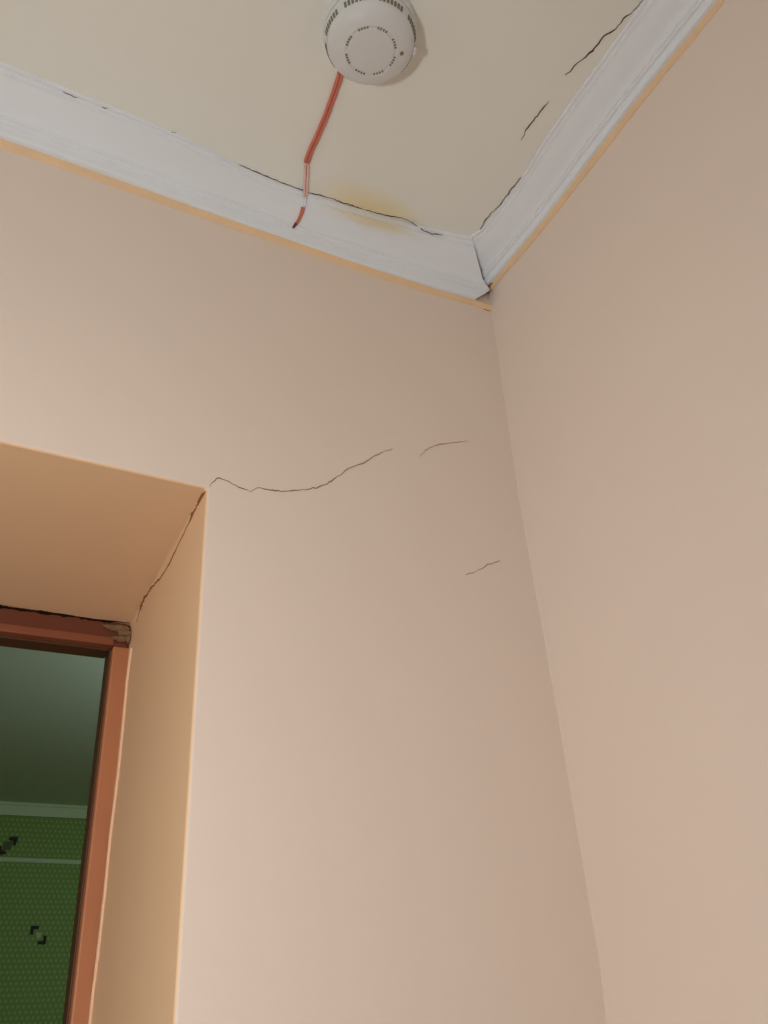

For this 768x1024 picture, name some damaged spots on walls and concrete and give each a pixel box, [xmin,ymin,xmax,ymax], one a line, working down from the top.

crack [567,0,643,74]
crack [241,165,440,235]
crack [480,177,522,229]
crack [0,449,392,623]